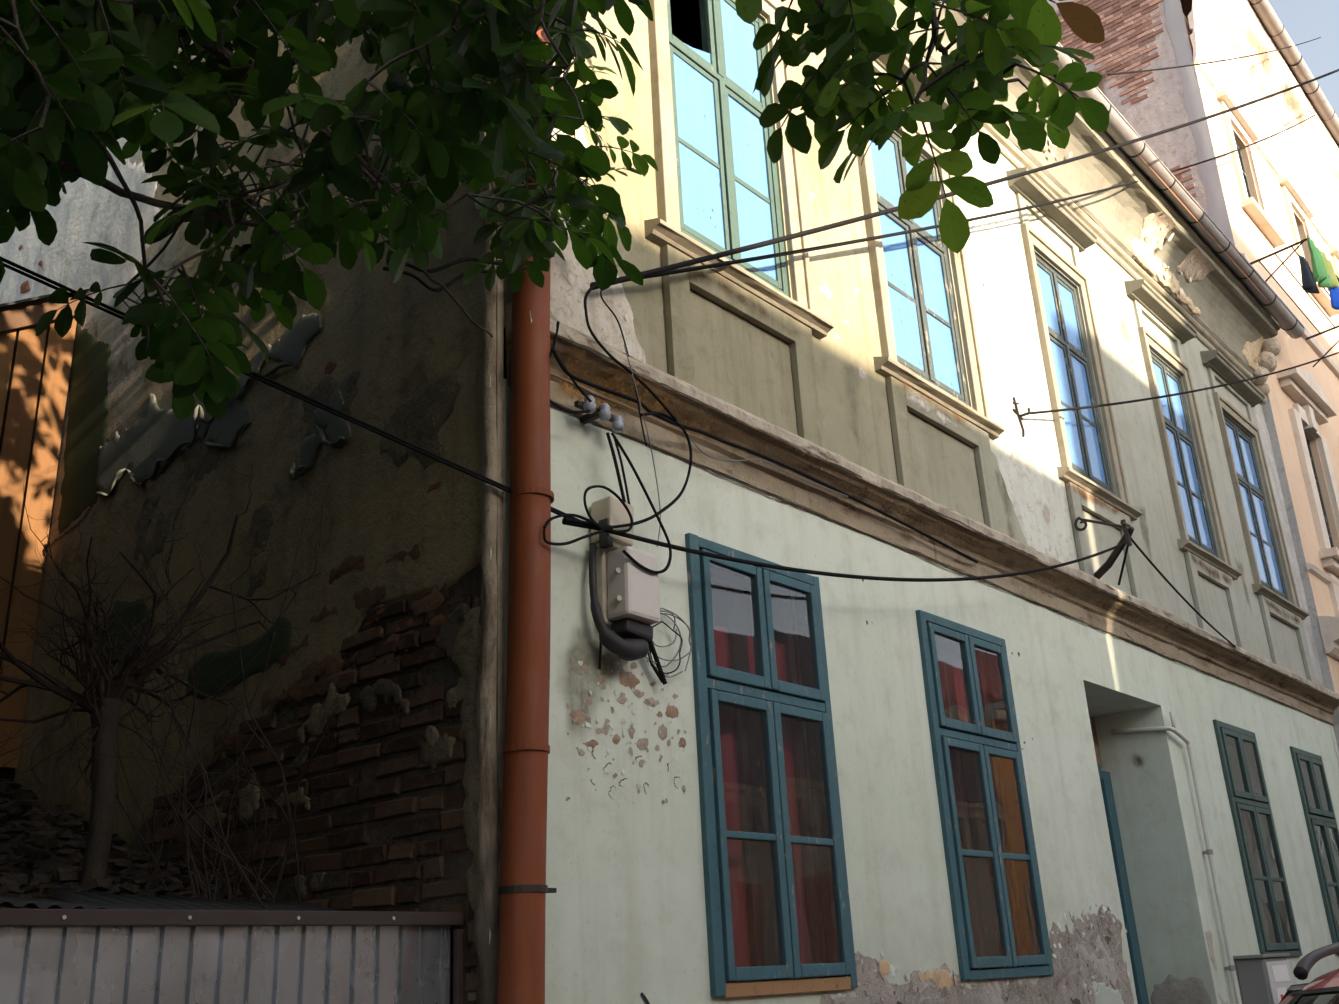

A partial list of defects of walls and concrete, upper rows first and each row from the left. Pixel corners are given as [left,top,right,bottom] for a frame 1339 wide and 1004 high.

flaking render [1057,0,1164,105]
flaking render [1169,165,1198,203]
flaking render [1129,210,1215,316]
peeling [225,313,323,403]
peeling [96,393,214,498]
peeling [314,387,352,449]
peeling [566,644,686,804]
peeling [820,903,1134,1004]
peeling [1150,974,1211,1004]